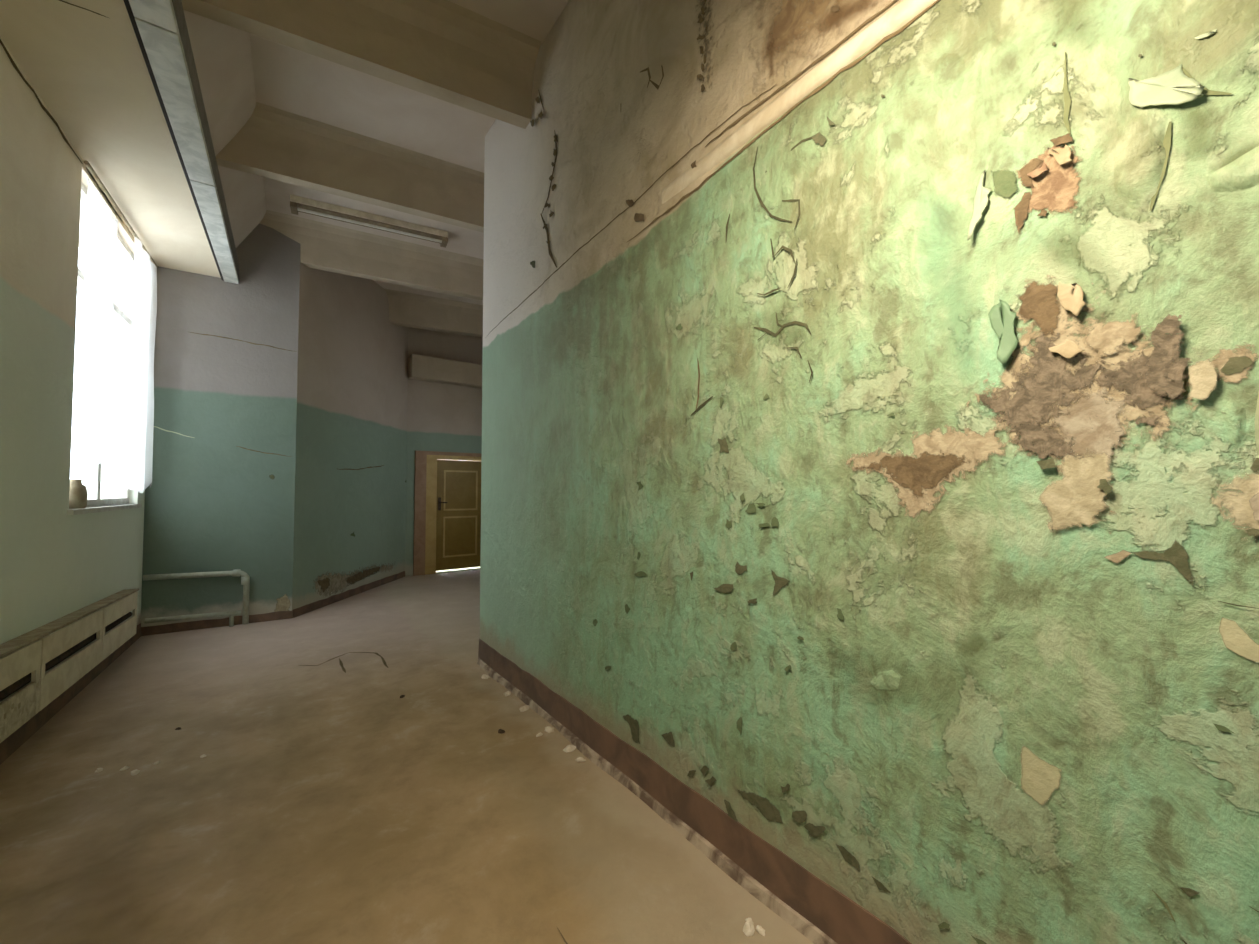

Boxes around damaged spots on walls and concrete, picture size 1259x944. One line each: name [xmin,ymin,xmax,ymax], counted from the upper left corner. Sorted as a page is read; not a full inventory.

crack [59,0,108,18]
damp [760,0,868,74]
crack [0,39,122,221]
spalling [967,133,1082,240]
spalling [846,275,1259,538]
peeling [1219,601,1259,663]
peeling [623,714,640,744]
peeling [662,732,675,747]
peeling [687,766,716,786]
peeling [1021,746,1061,805]
peeling [724,790,826,837]
peeling [836,844,890,893]